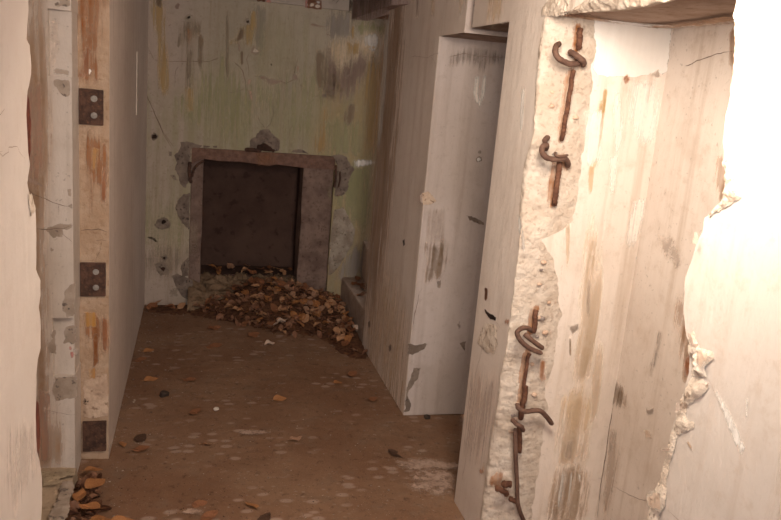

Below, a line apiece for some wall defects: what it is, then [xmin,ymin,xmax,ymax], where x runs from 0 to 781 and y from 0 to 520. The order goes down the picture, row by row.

corrosion [79,0,99,81]
water stain [315,48,385,167]
corrosion [558,14,618,142]
corrosion [644,17,736,68]
corrosion [86,133,106,201]
flaking render [169,141,217,229]
flaking render [709,160,741,216]
flaking render [328,207,355,275]
spalling [473,0,675,520]
corrosion [85,312,109,378]
flaking render [407,343,426,355]
flaking render [645,331,714,520]